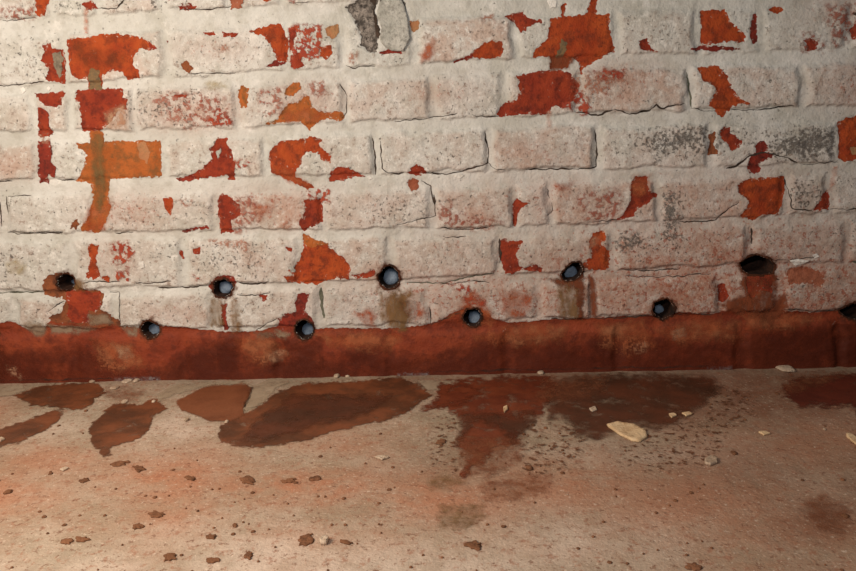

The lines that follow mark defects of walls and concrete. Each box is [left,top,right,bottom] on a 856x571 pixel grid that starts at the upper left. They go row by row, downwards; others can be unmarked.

crack [732,104,793,112]
crack [526,72,703,215]
peeling [0,0,856,384]
crack [372,113,505,284]
crack [679,202,739,223]
crack [624,268,711,278]
damp [358,292,411,331]
crack [596,313,651,321]
damp [782,370,856,409]